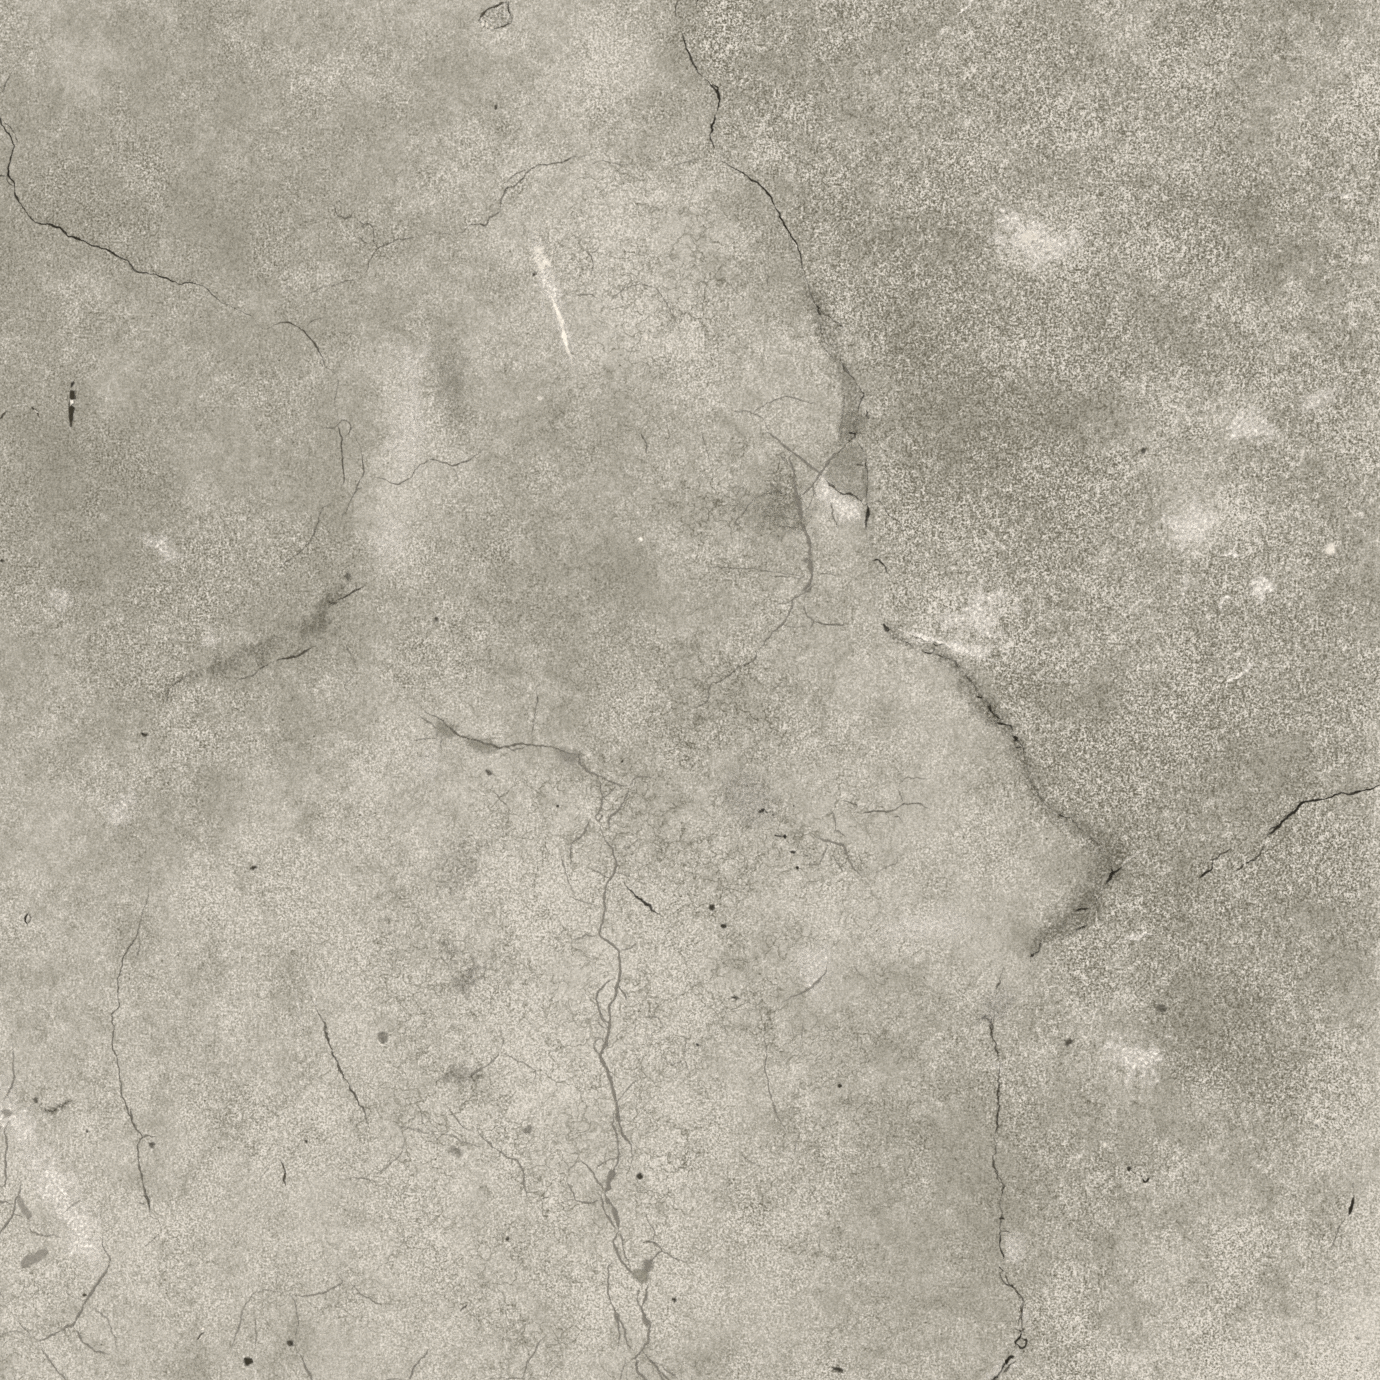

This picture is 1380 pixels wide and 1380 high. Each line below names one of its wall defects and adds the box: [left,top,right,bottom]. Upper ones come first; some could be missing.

crack [675,0,803,269]
crack [0,82,328,369]
crack [701,366,898,705]
crack [970,680,1024,752]
crack [810,801,921,875]
crack [1198,785,1380,878]
crack [1076,866,1123,930]
crack [790,971,826,997]
crack [427,715,678,1380]
crack [764,1044,796,1155]
crack [988,941,1041,1380]
crack [233,1280,374,1342]